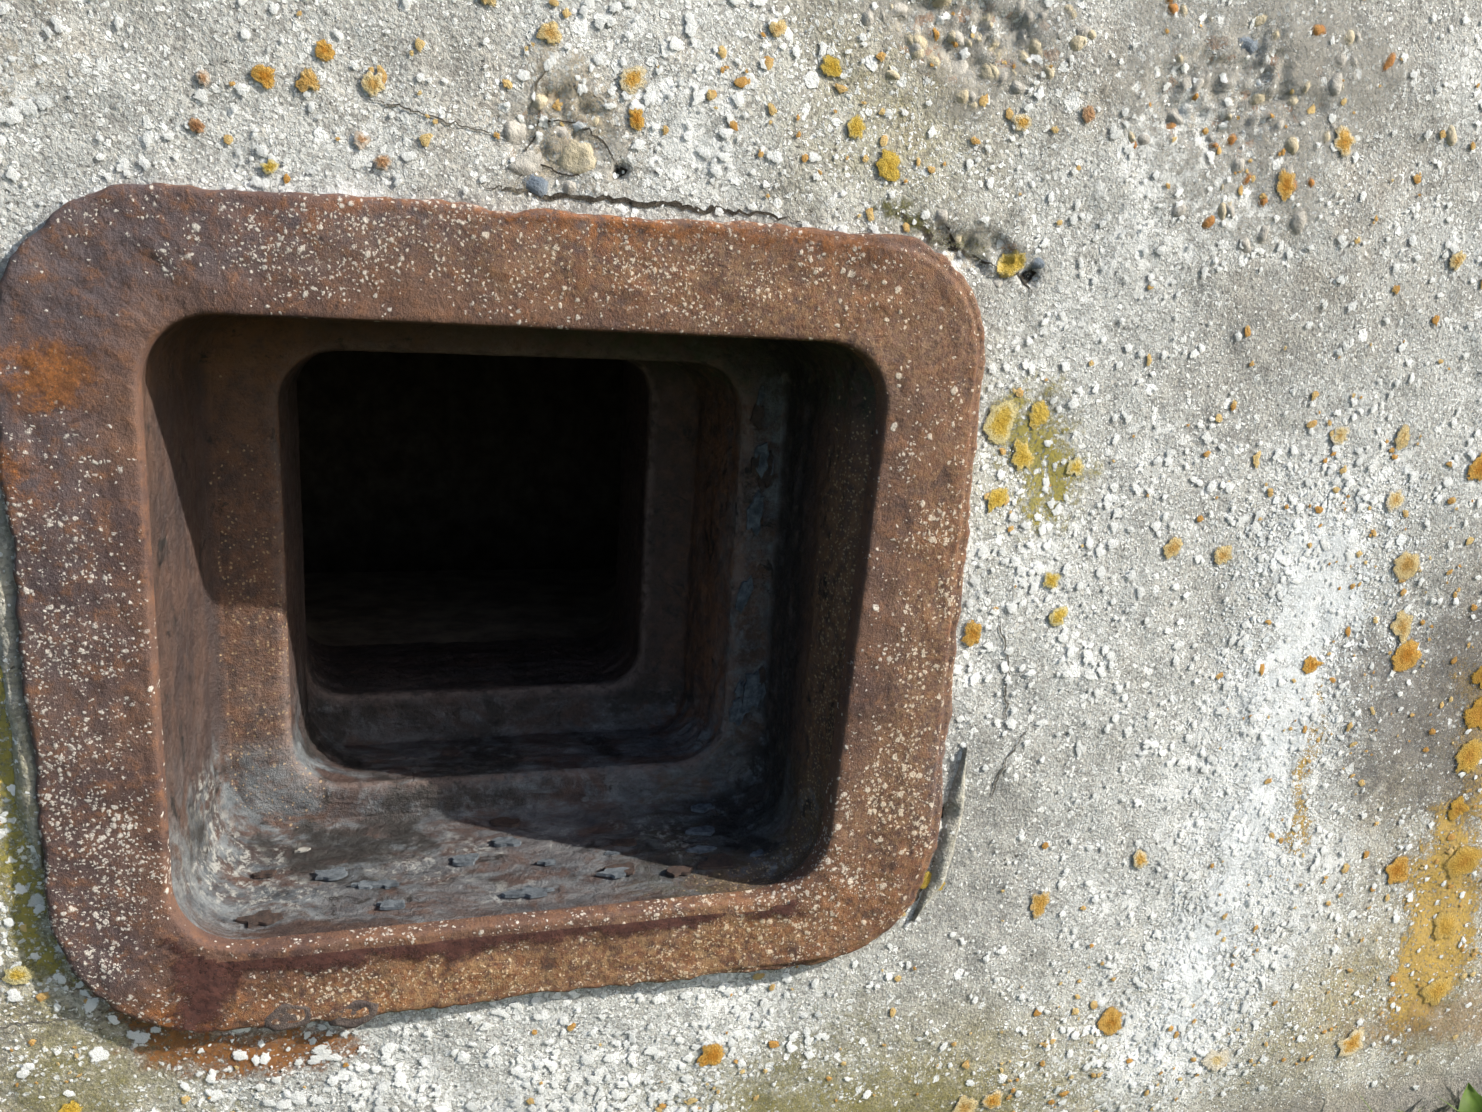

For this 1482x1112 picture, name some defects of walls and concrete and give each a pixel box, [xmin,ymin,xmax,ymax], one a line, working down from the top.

crack [369,70,801,222]
rust [492,212,885,259]
rust [4,342,100,414]
rust [74,895,811,1080]